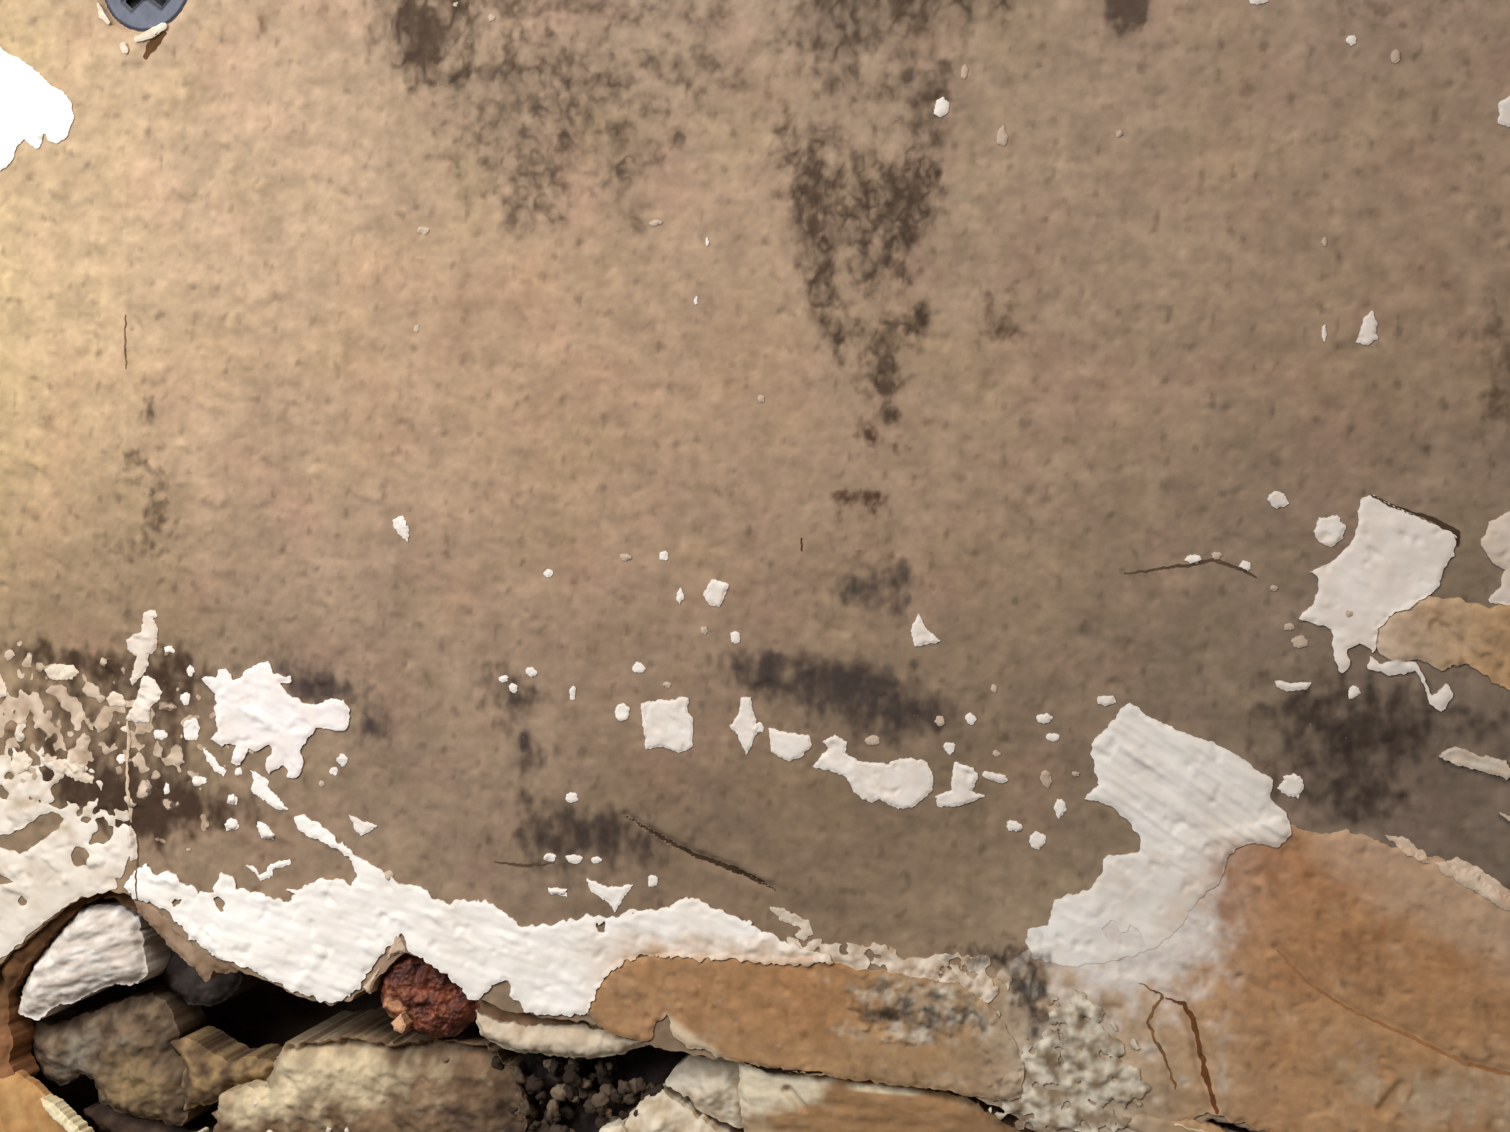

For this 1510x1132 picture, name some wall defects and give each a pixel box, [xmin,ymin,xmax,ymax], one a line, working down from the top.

damp [396,0,467,83]
peeling [1498,96,1510,127]
damp [793,151,834,282]
damp [846,169,939,276]
peeling [1356,311,1378,345]
peeling [1299,494,1457,711]
peeling [1481,512,1510,605]
damp [509,678,535,706]
damp [733,651,940,738]
peeling [0,610,833,1017]
damp [516,809,663,867]
crack [1139,983,1255,1132]